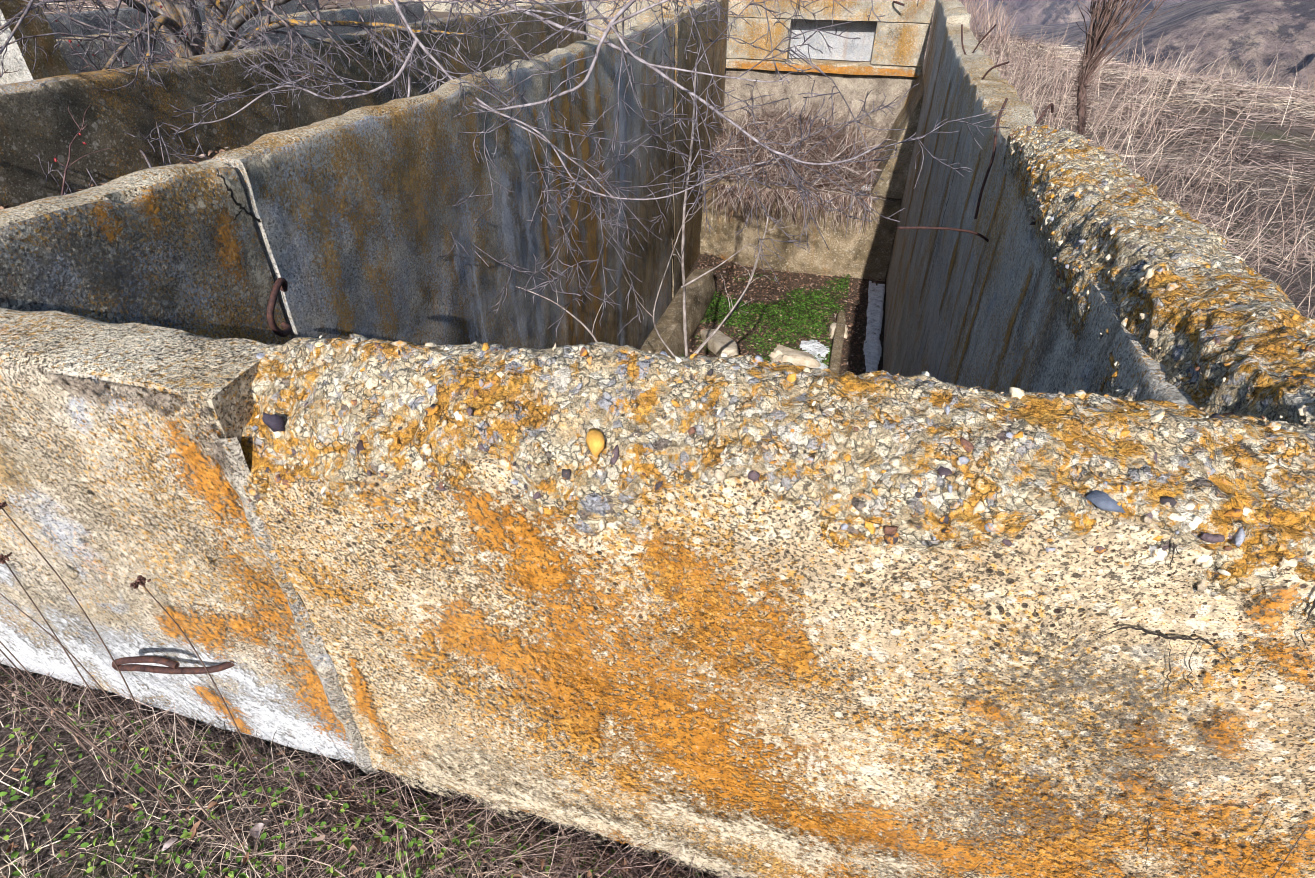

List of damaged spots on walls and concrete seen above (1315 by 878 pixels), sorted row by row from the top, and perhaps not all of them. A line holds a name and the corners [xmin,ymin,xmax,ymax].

rust [258,92,517,344]
rust [532,47,609,345]
rust [0,412,34,498]
spalling [38,124,1315,628]
rust [156,397,1315,878]
crack [1096,627,1234,697]